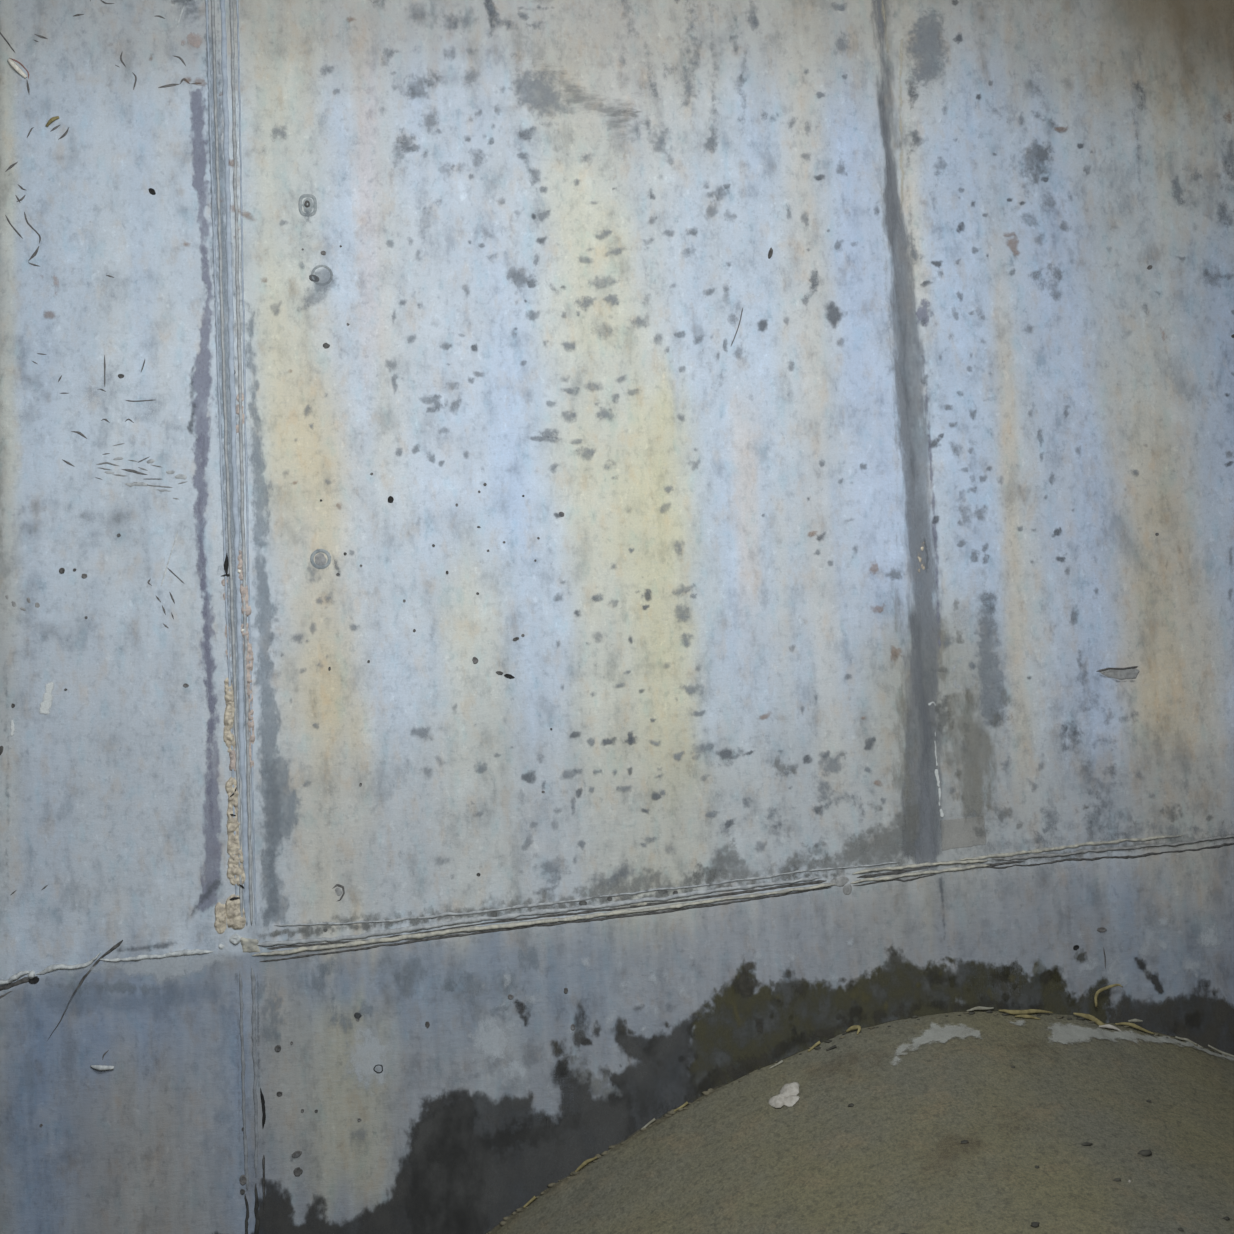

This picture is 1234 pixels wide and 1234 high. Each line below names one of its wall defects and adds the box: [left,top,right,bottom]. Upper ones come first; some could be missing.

damp [191,90,206,197]
damp [188,246,212,519]
damp [783,121,954,878]
damp [198,550,219,739]
damp [198,779,221,911]
damp [512,871,670,910]
crack [260,866,937,962]
crack [985,843,1234,869]
crack [0,940,221,1041]
damp [894,1023,980,1064]
damp [1049,958,1234,1059]
damp [252,1007,696,1234]